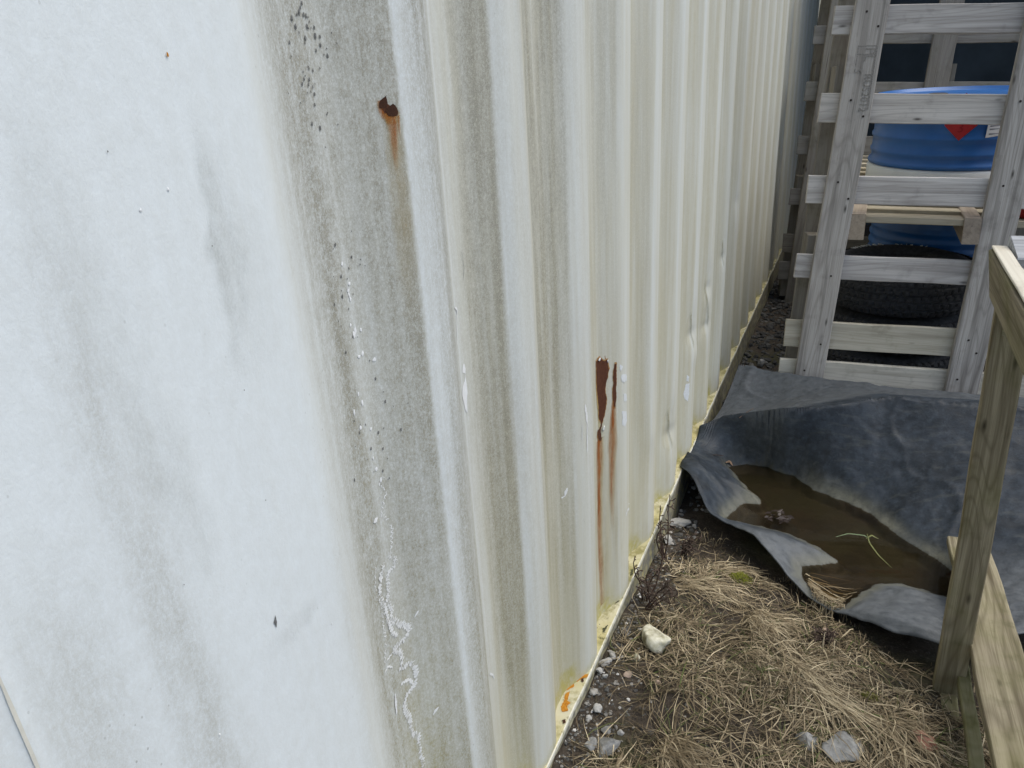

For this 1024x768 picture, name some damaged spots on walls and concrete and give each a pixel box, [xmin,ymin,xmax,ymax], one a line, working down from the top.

water stain [289,0,338,106]
corrosion [378,95,399,146]
corrosion [609,362,617,494]